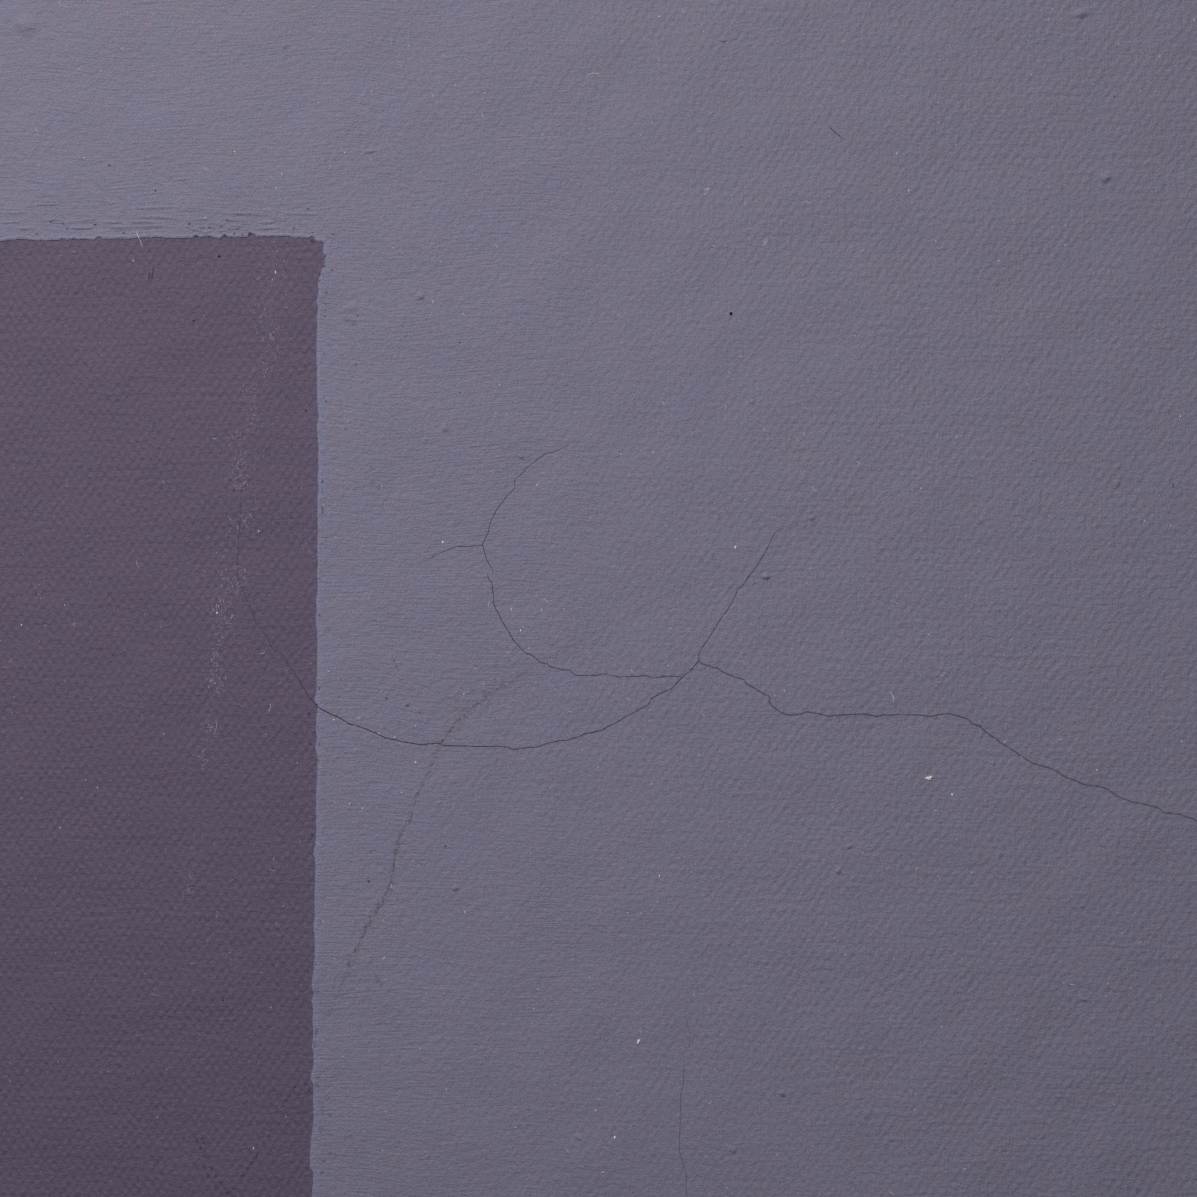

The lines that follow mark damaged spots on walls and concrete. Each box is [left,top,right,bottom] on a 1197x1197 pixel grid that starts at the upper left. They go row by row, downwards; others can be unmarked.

crack [453,481,662,678]
crack [315,703,619,750]